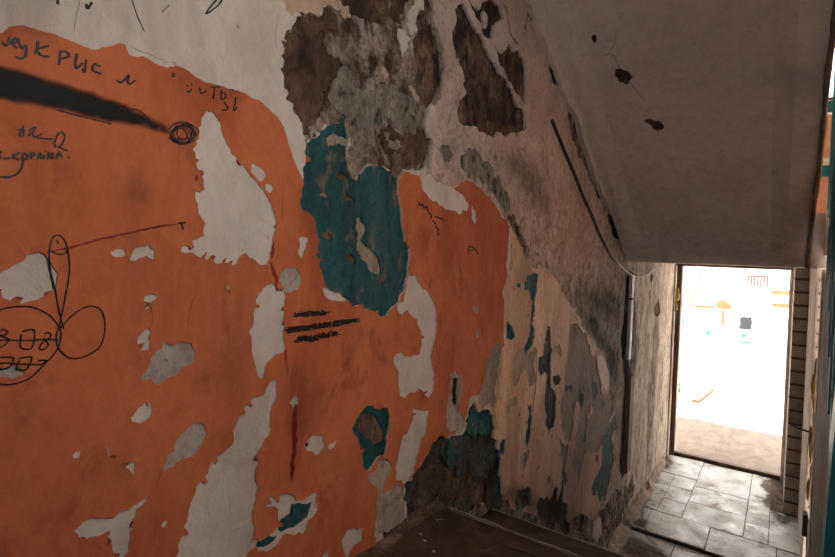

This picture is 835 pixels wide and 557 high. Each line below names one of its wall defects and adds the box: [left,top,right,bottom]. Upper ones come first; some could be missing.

spalling [644,119,664,131]
peeling [181,111,278,265]
spalling [281,0,528,398]
peeling [0,252,57,304]
spalling [136,328,195,384]
spalling [164,423,206,470]
peeling [177,380,317,557]
peeling [249,267,301,378]
peeling [305,435,336,454]
spalling [352,322,514,536]
peeling [512,273,634,543]
peeling [342,527,363,557]